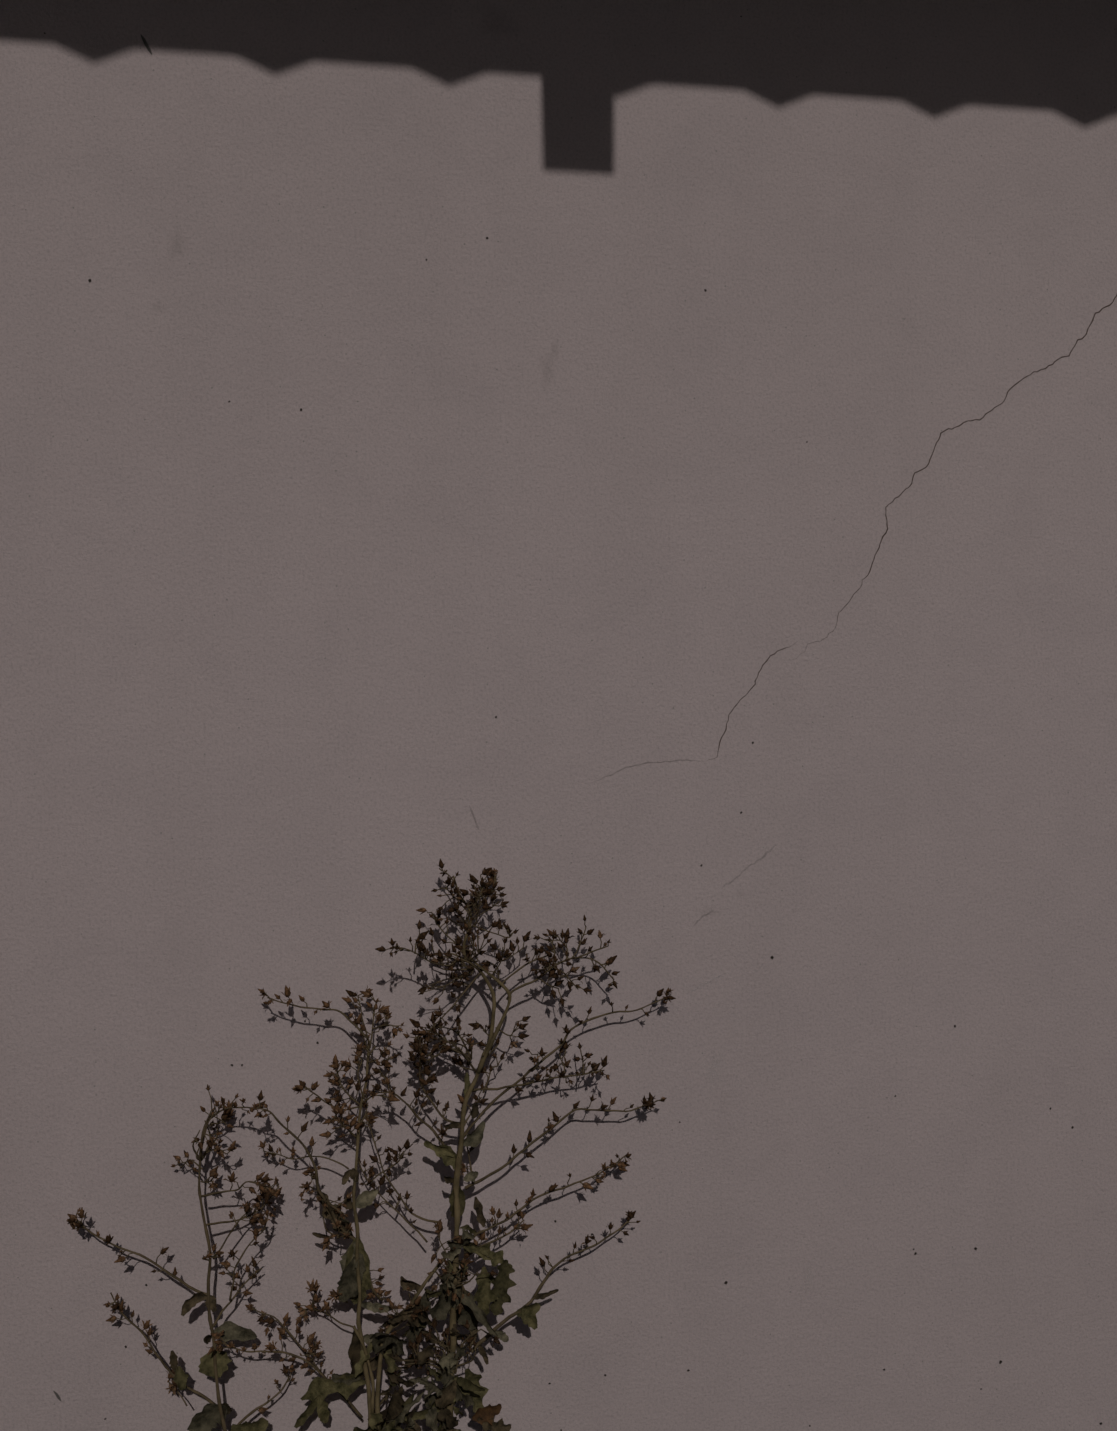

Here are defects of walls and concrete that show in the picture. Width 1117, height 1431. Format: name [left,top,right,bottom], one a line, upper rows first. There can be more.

crack [830,295,1117,633]
crack [717,647,788,757]